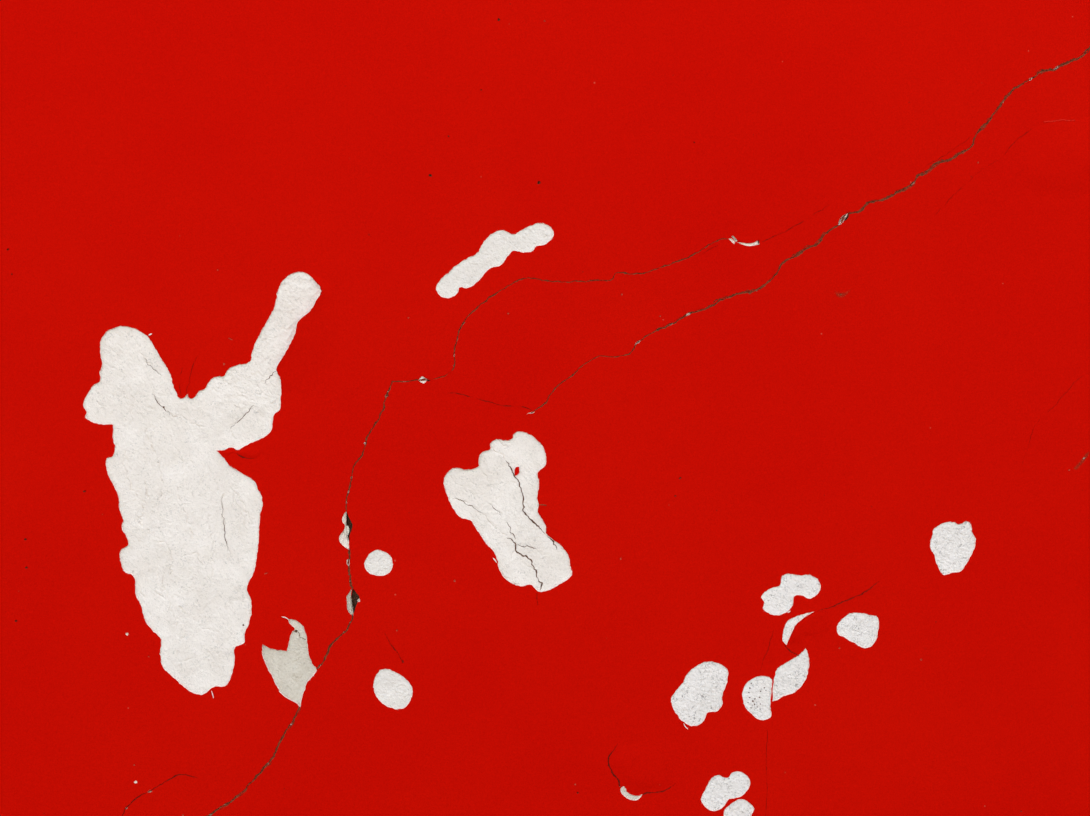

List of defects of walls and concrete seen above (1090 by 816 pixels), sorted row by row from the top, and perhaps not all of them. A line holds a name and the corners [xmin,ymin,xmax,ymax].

peeling [436,223,554,298]
crack [316,46,1090,669]
peeling [83,272,321,707]
peeling [443,431,572,592]
peeling [930,521,976,575]
peeling [761,574,821,645]
peeling [671,661,728,729]
peeling [742,648,809,720]
crack [122,774,197,816]
crack [207,707,301,816]
crack [608,745,672,795]
peeling [701,771,754,816]